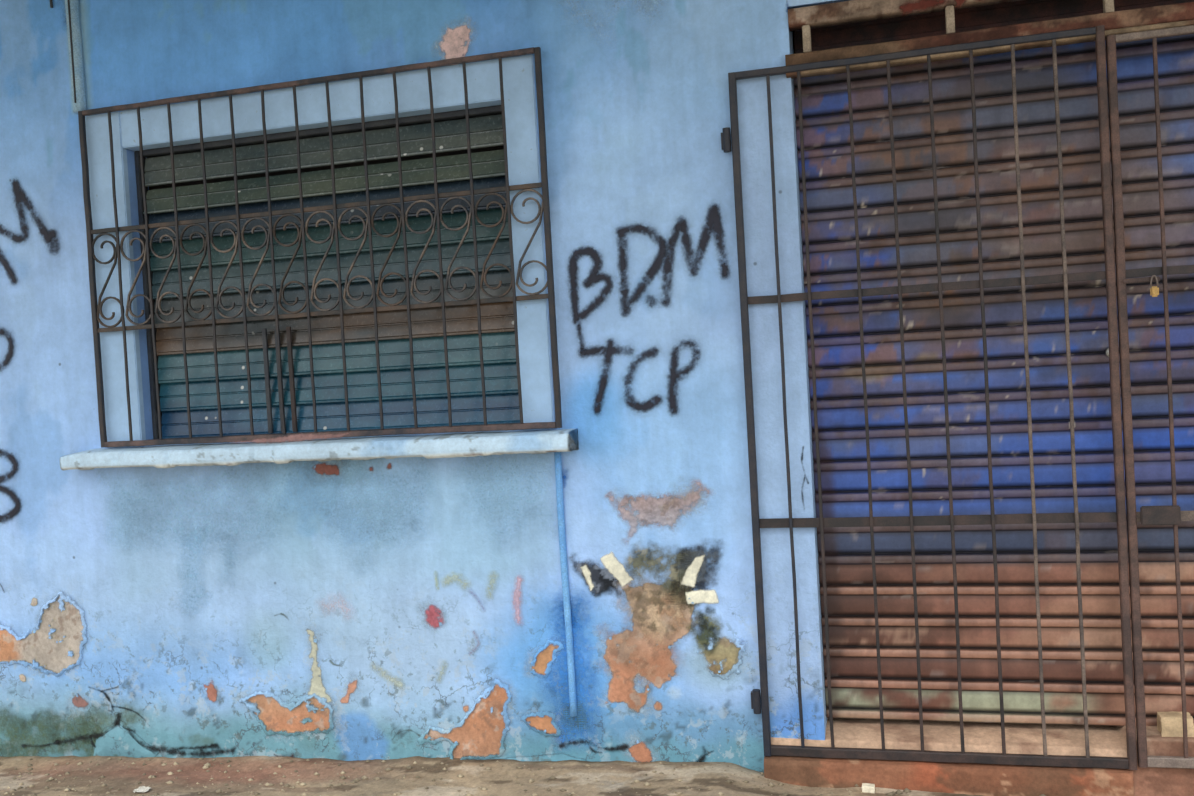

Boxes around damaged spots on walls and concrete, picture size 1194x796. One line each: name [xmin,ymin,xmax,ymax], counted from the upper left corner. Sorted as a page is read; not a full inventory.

rust [899,0,982,15]
peeling [436,20,473,66]
spalling [313,460,341,476]
peeling [606,482,709,537]
peeling [0,592,87,682]
peeling [424,604,443,628]
peeling [529,640,564,678]
peeling [603,583,694,713]
leakage [0,710,129,757]
crack [22,687,234,756]
peeling [238,678,358,737]
peeling [417,678,561,760]